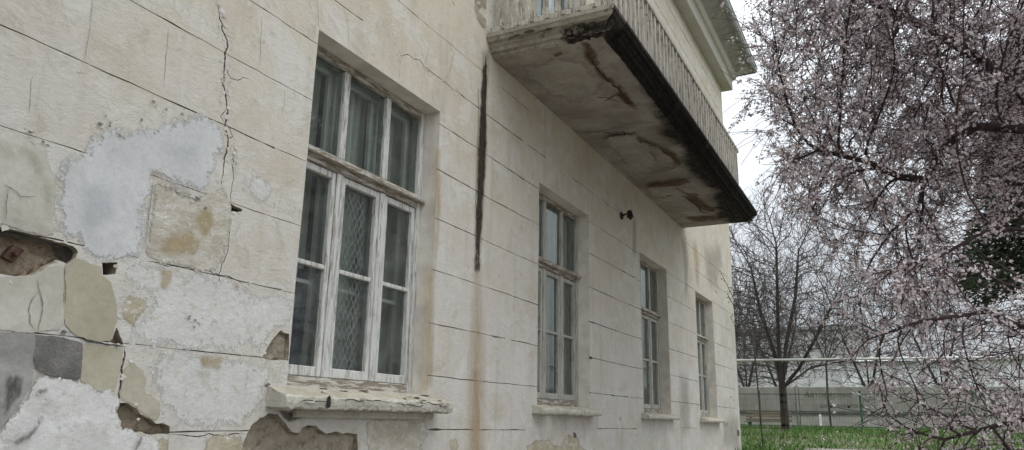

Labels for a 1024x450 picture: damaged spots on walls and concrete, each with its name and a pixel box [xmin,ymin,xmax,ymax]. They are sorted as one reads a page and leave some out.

crack [216,2,262,194]
leakage [474,57,487,271]
leakage [610,21,758,224]
peeling [0,129,429,450]
peeling [527,433,586,450]